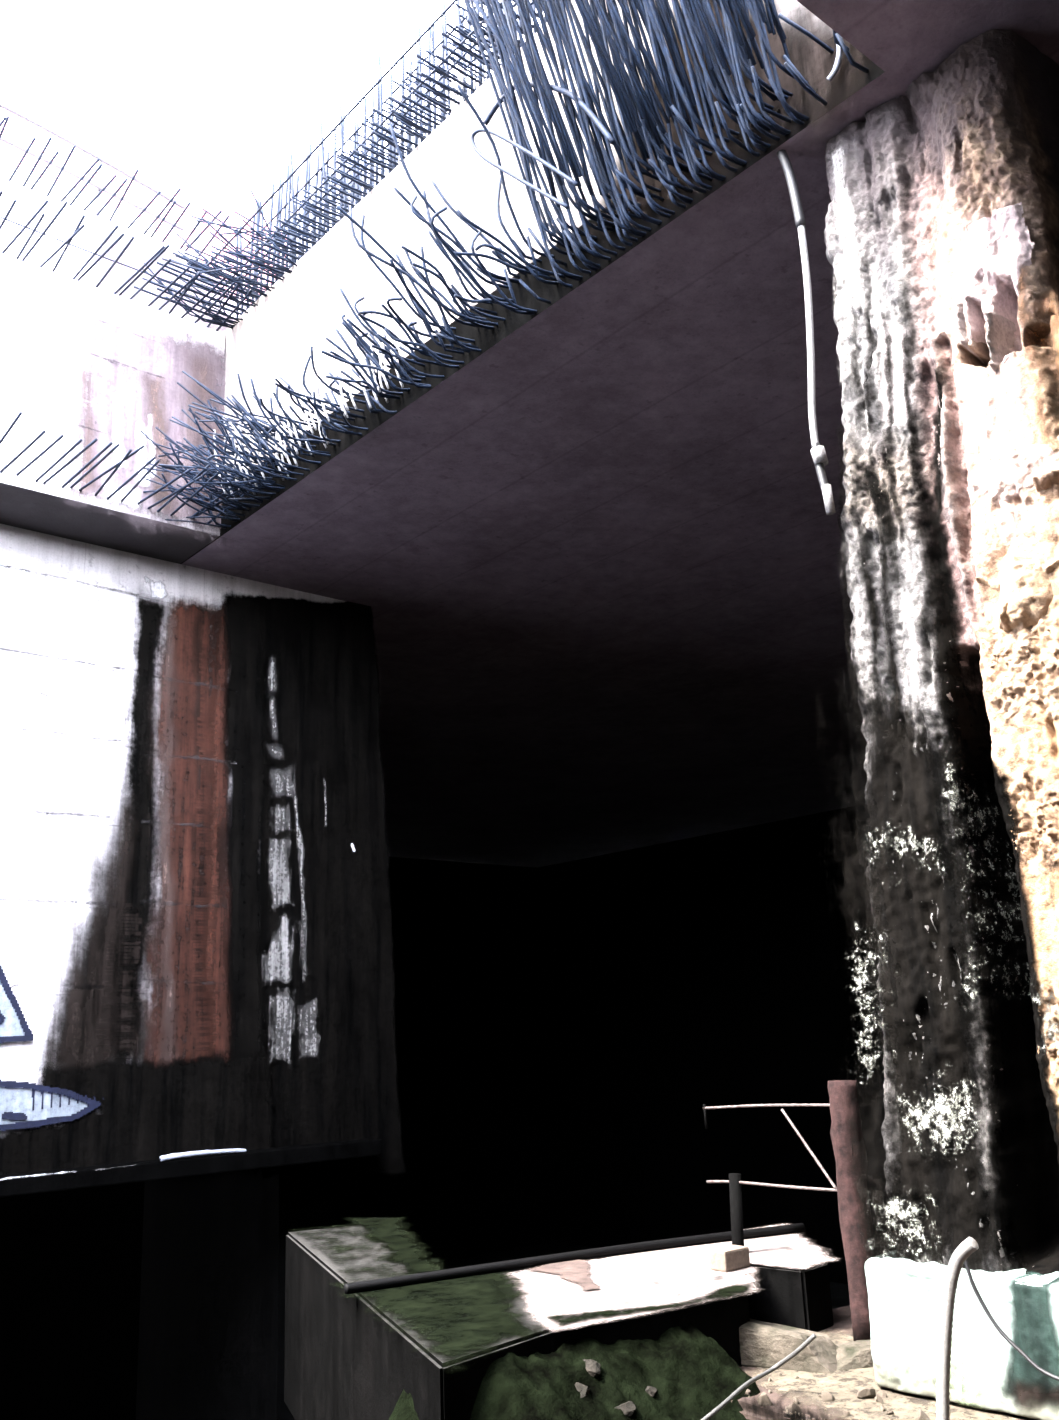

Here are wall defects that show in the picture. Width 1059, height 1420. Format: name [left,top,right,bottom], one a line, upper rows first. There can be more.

spalling [0,0,809,527]
flaking render [954,202,1035,371]
spalling [968,435,1059,501]
rust [144,600,233,1066]
leakage [0,578,406,1184]
leakage [832,147,1059,1395]
leakage [932,1328,985,1410]